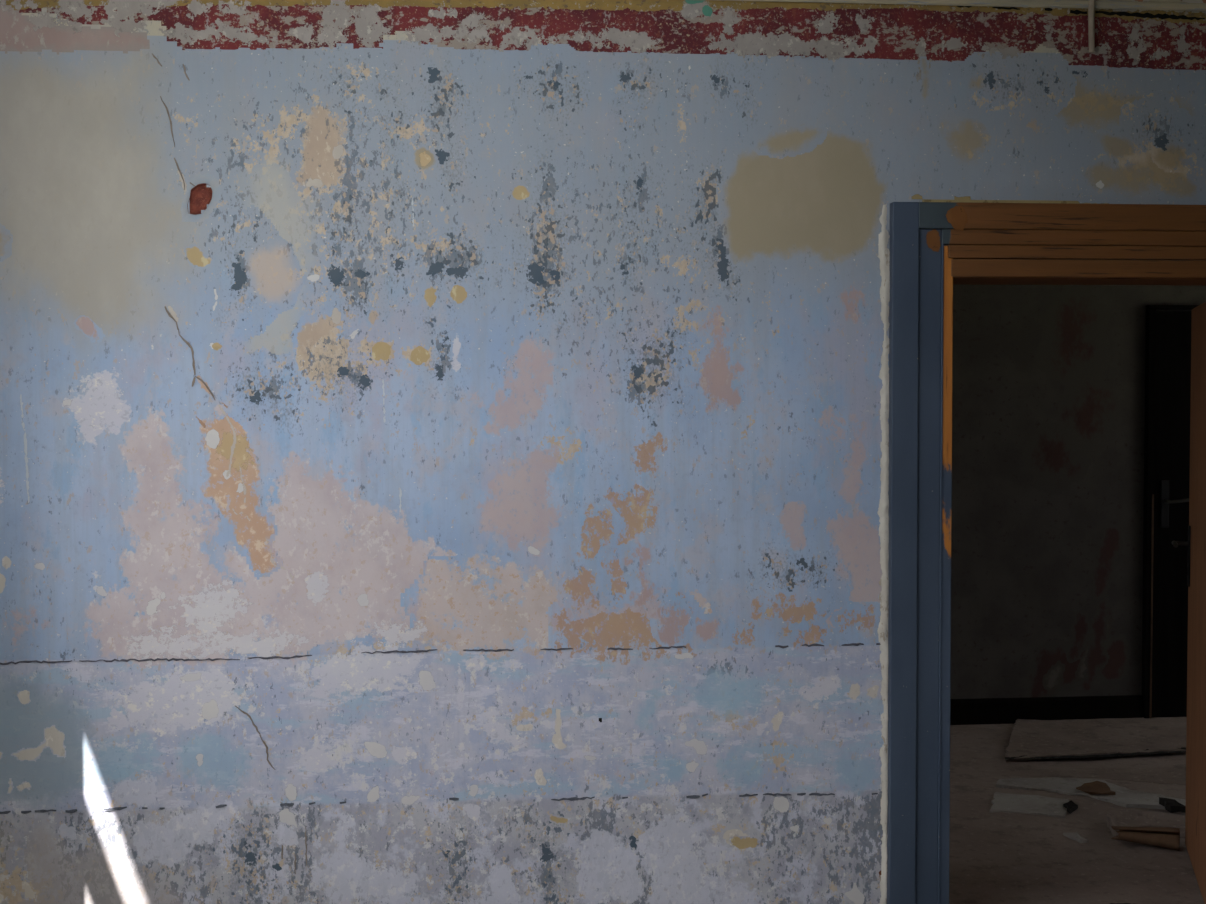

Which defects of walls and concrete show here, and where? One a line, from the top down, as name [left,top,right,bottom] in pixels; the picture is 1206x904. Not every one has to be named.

peeling [0,0,661,54]
peeling [681,1,878,60]
peeling [1125,22,1191,67]
flaking render [288,95,355,198]
spalling [180,173,221,222]
crack [165,306,215,400]
crack [0,655,312,665]
peeling [0,354,605,904]
crack [362,647,573,655]
crack [775,642,881,650]
crack [0,806,165,814]
crack [739,791,835,799]